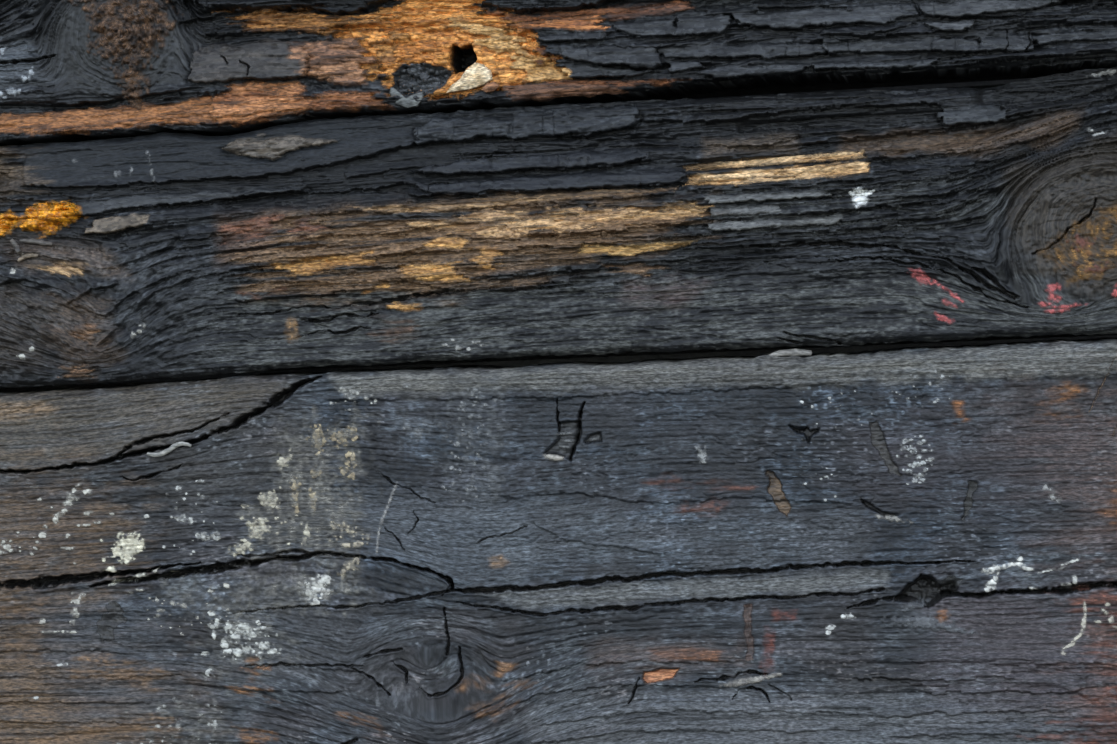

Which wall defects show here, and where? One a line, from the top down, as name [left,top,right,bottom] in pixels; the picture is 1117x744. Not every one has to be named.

spalling [0,0,1117,134]
peeling [271,251,385,274]
peeling [387,303,421,311]
peeling [364,151,869,281]
peeling [849,188,874,207]
crack [0,376,322,481]
crack [0,476,975,697]
crack [950,581,1117,598]